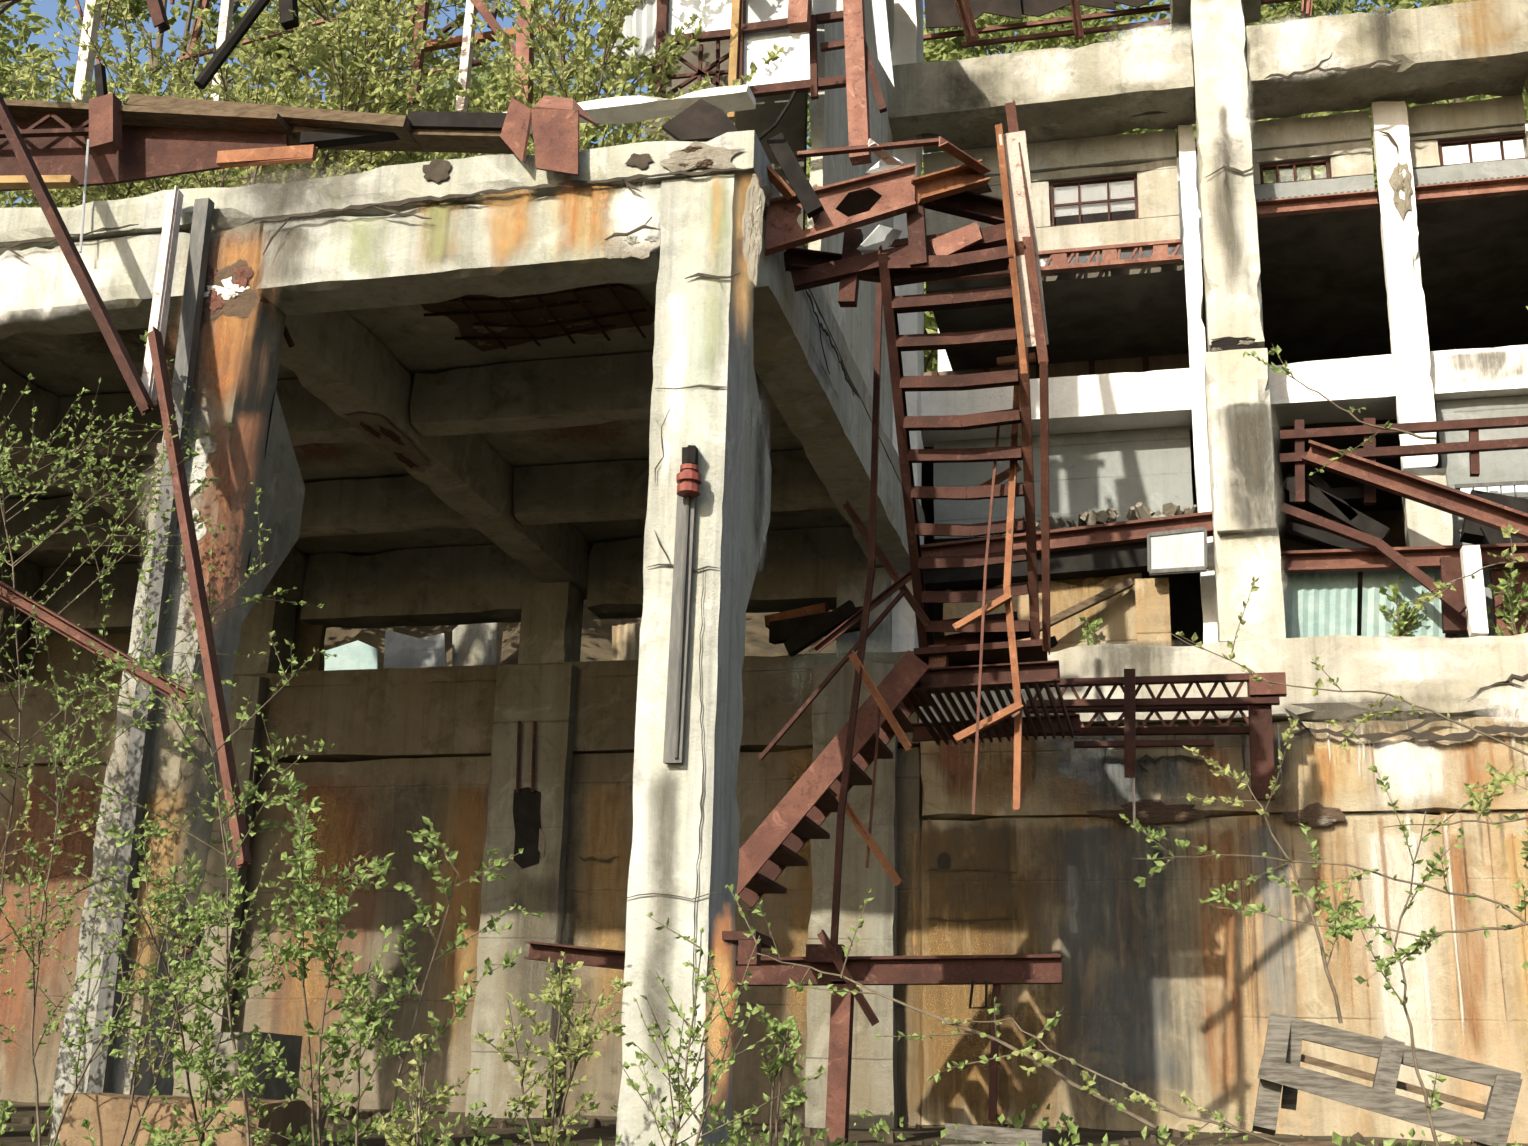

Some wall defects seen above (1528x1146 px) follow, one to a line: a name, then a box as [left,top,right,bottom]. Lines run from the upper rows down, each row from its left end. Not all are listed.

crack [1264,52,1403,79]
spalling [601,234,661,259]
spalling [625,141,765,286]
spalling [1388,162,1413,220]
spalling [200,258,260,325]
rust [197,524,226,595]
rust [937,736,1035,797]
spalling [1086,799,1211,823]
spalling [1281,802,1345,827]
rust [1487,814,1528,1006]
rust [1201,821,1257,1092]
rust [927,985,1005,1103]